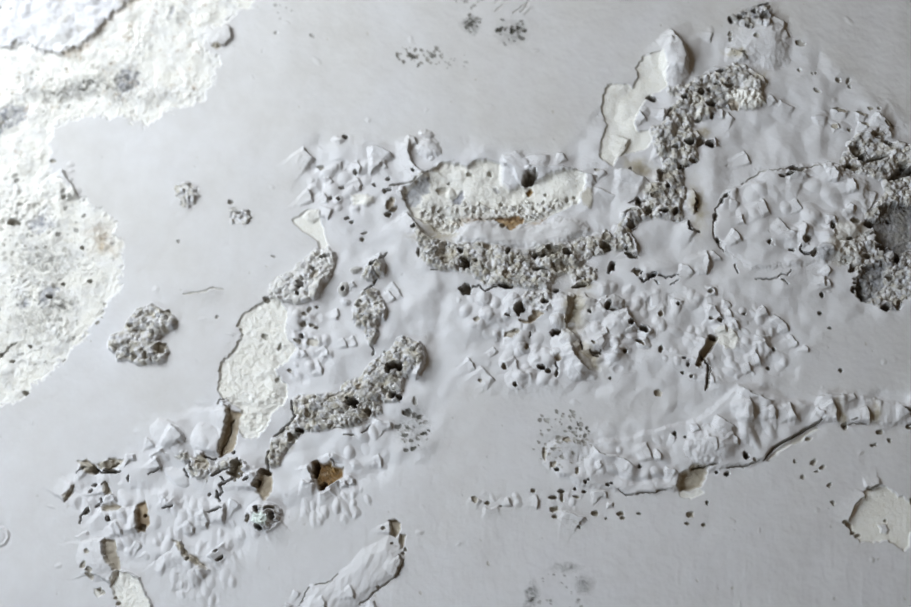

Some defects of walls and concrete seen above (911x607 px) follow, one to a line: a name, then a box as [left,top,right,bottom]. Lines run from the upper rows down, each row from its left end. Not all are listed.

water stain [395,46,469,69]
water stain [455,0,535,46]
flaking render [731,3,789,39]
flaking render [0,0,255,407]
spalling [829,112,911,313]
spalling [57,48,794,607]
peeling [843,481,911,551]